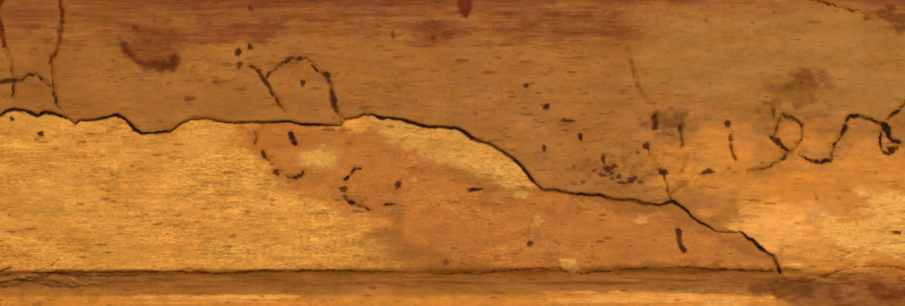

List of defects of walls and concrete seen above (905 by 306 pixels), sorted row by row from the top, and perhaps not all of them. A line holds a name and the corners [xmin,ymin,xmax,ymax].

water stain [121,42,179,71]
crack [0,0,781,275]
crack [761,104,905,169]
crack [0,259,390,288]